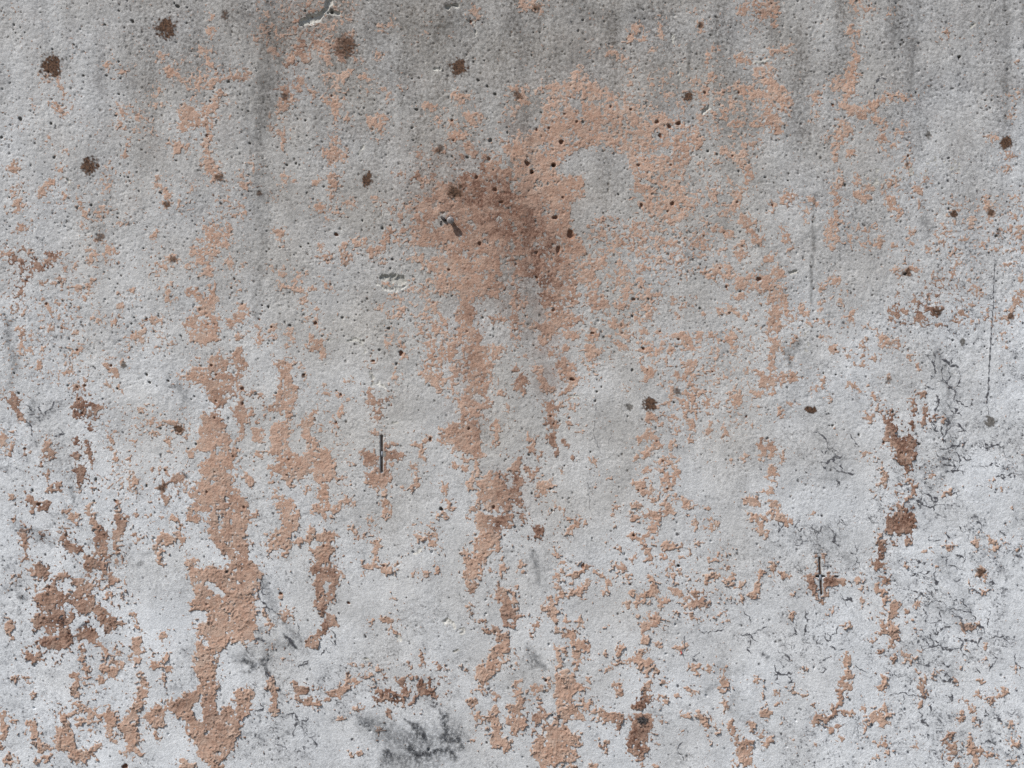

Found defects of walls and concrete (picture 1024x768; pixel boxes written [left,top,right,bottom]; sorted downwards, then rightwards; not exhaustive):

rust [155,16,178,41]
rust [39,53,63,77]
rust [81,155,99,176]
rust [447,184,462,198]
rust [642,396,657,411]
crack [916,264,1015,511]
crack [816,432,859,485]
peeling [363,591,406,644]
crack [683,593,866,684]
crack [889,526,1023,727]
leakage [377,712,463,764]
crack [977,709,1002,748]